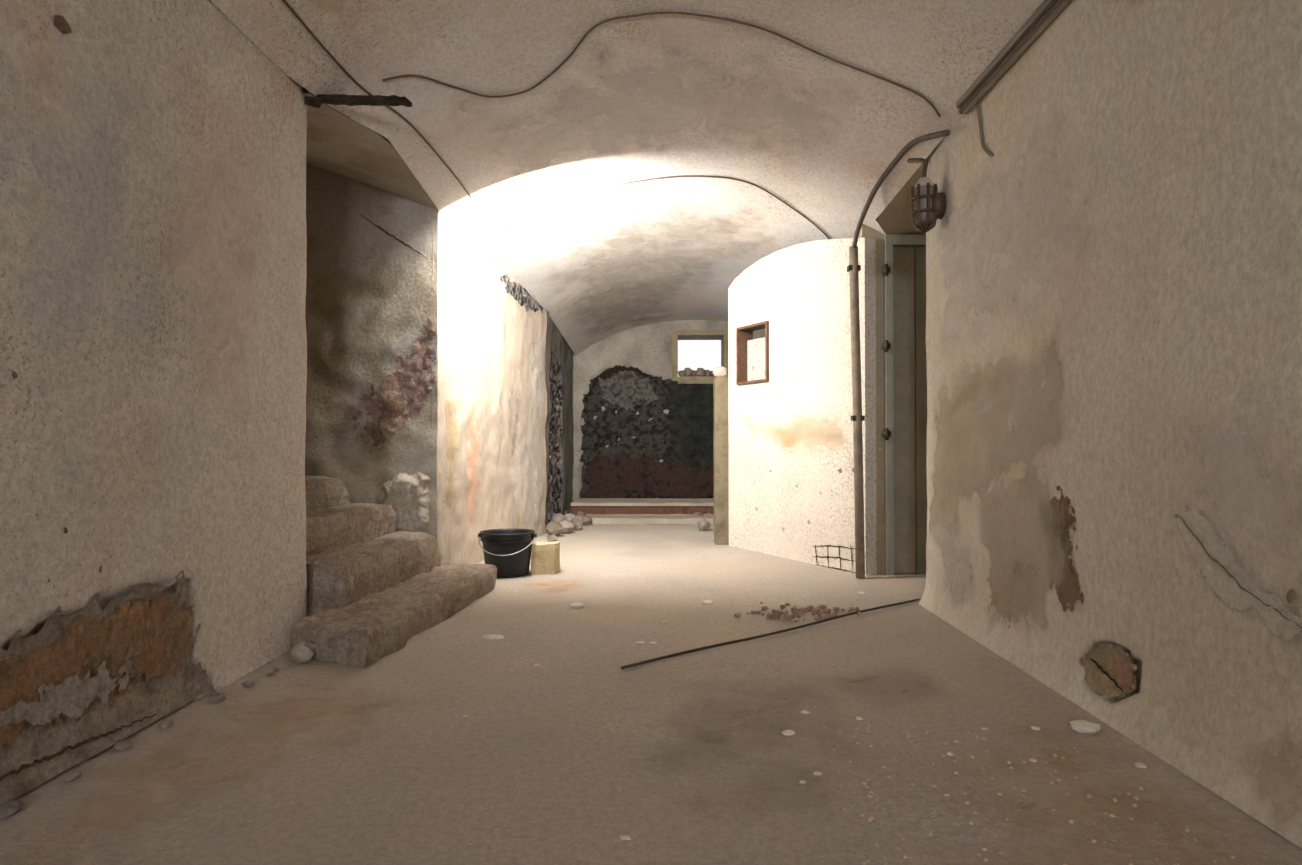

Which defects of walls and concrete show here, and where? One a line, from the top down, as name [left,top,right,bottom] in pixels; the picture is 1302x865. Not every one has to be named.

spalling [0,571,220,804]